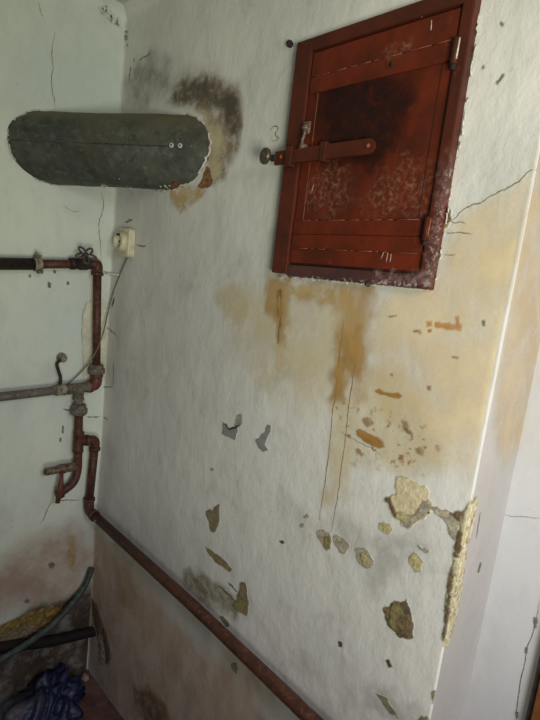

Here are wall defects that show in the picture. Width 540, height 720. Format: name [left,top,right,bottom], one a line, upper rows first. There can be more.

crack [49,35,57,108]
crack [450,169,538,235]
damp [266,281,371,396]
peeling [373,187,503,443]
peeling [222,414,242,440]
peeling [255,424,272,452]
spalling [206,504,220,533]
spalling [205,546,232,572]
spalling [316,529,374,569]
spalling [379,475,478,647]
damp [0,537,256,720]
spalling [219,581,249,616]